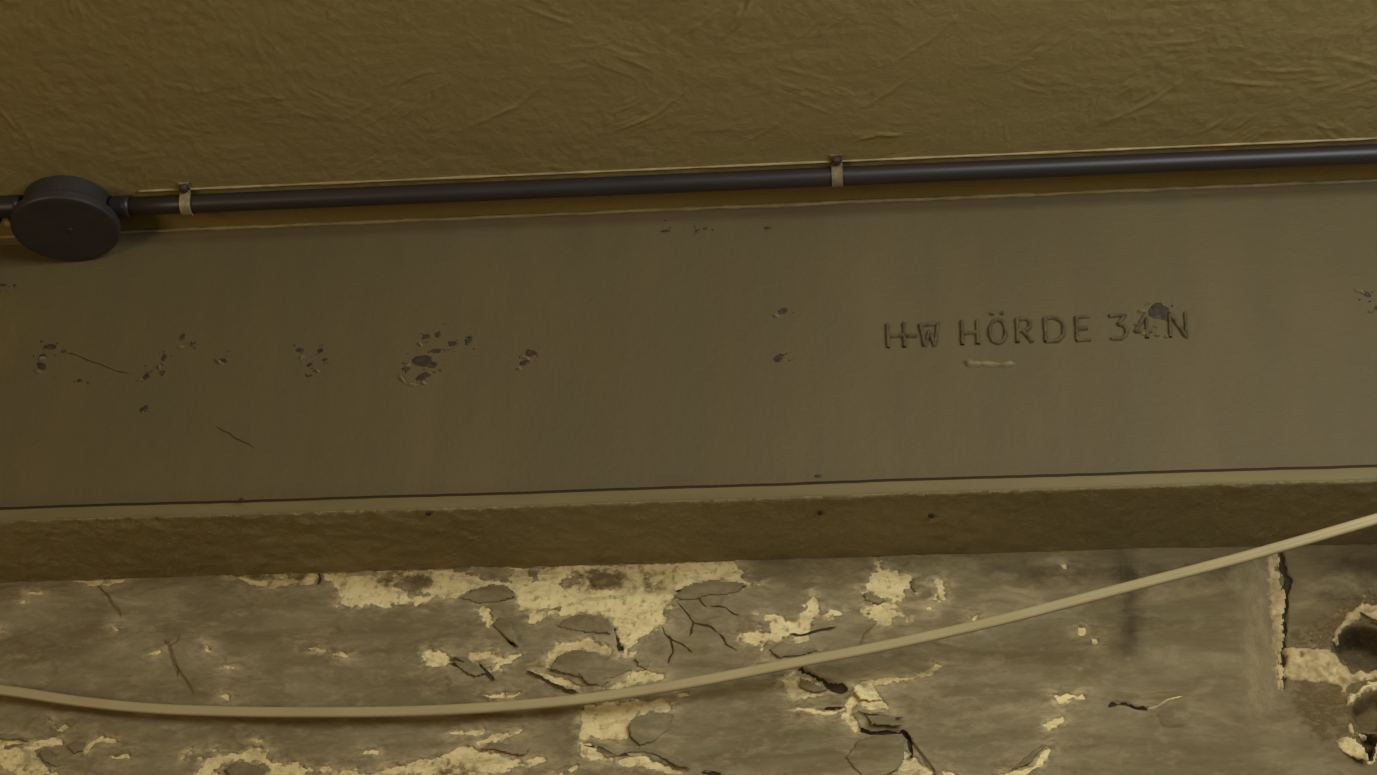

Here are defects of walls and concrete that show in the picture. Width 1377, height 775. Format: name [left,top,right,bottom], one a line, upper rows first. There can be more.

peeling [398,323,475,387]
flaking render [78,579,125,587]
flaking render [860,557,947,626]
flaking render [180,561,760,775]
crack [614,628,624,652]
crack [662,598,739,664]
flaking render [736,596,955,775]
spalling [1234,554,1377,764]
flaking render [0,721,130,775]
crack [798,667,936,775]